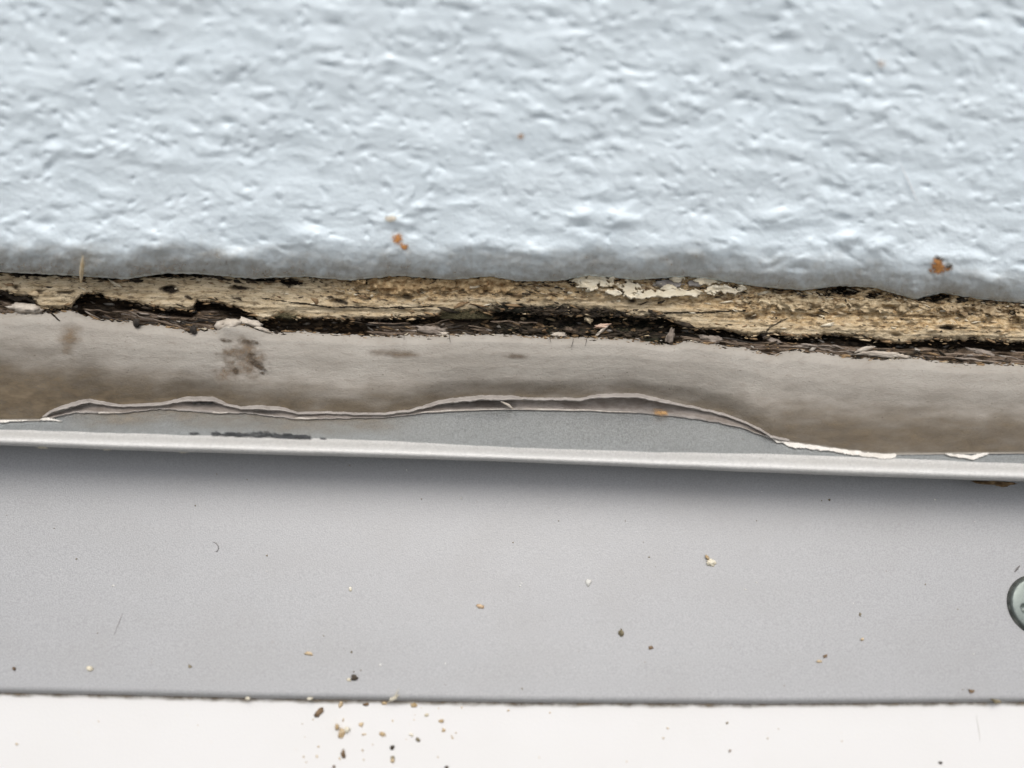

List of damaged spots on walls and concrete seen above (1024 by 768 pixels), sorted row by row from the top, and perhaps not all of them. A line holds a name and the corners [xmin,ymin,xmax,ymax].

spalling [354,276,522,296]
spalling [570,275,1024,323]
leakage [221,339,266,374]